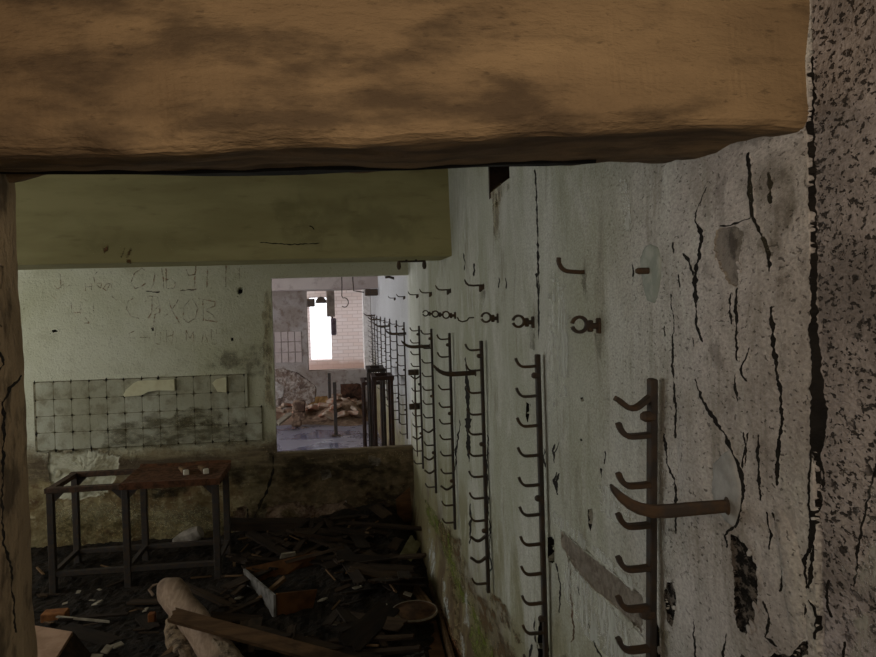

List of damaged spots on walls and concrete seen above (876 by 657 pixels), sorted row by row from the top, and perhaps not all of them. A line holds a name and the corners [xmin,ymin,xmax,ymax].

crack [0,159,596,339]
peeling [711,220,747,291]
crack [663,152,785,550]
crack [801,56,848,657]
damp [102,407,247,448]
damp [425,500,520,657]
peeling [547,530,645,635]
spalling [657,578,678,657]
spalling [728,531,762,657]
crack [762,569,783,647]
spalling [767,638,812,657]
crack [853,459,876,587]